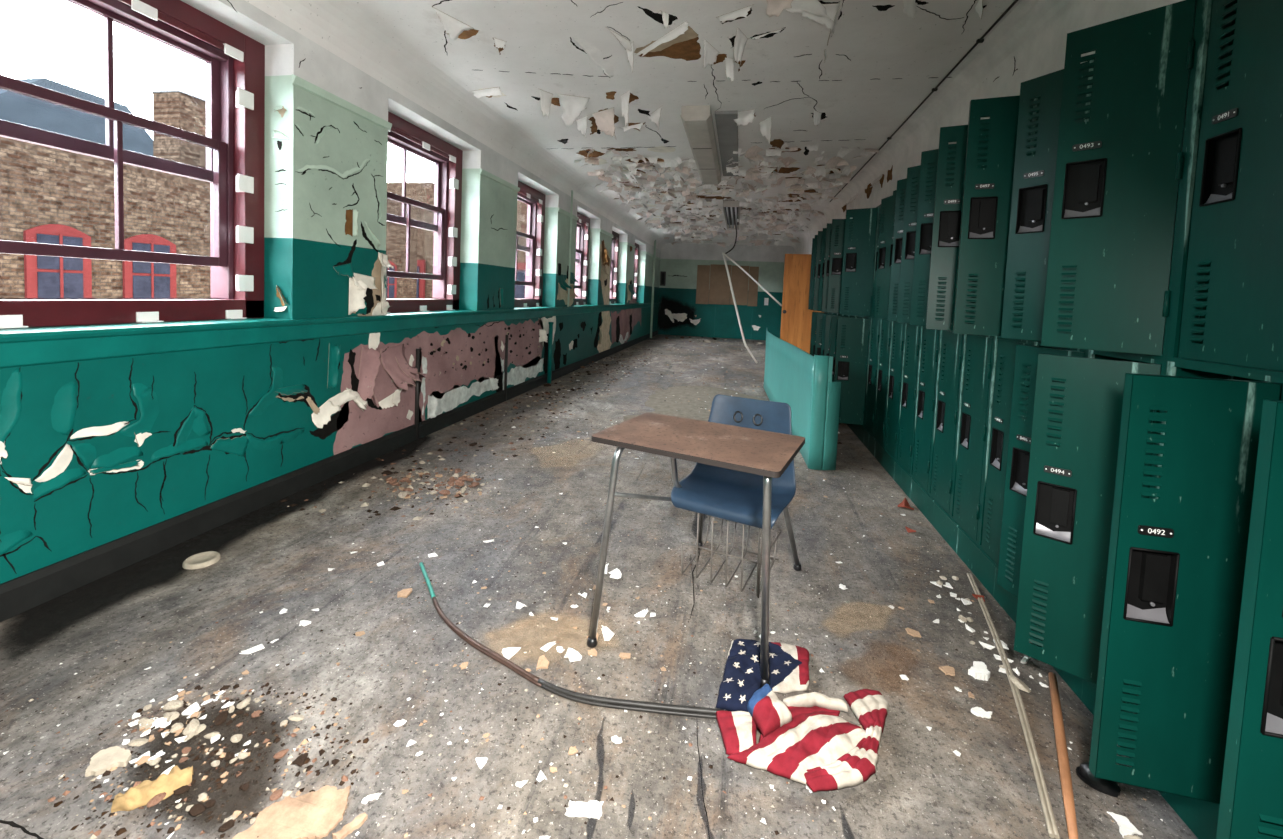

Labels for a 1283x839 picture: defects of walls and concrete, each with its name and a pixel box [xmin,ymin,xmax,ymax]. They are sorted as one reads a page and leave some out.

peeling [606,0,851,82]
crack [917,0,983,32]
crack [687,67,951,109]
crack [295,107,385,246]
peeling [531,82,893,247]
crack [761,130,866,155]
peeling [333,209,394,316]
spalling [273,240,641,455]
peeling [0,441,33,495]
peeling [88,432,162,476]
crack [0,338,320,574]
crack [0,820,44,839]